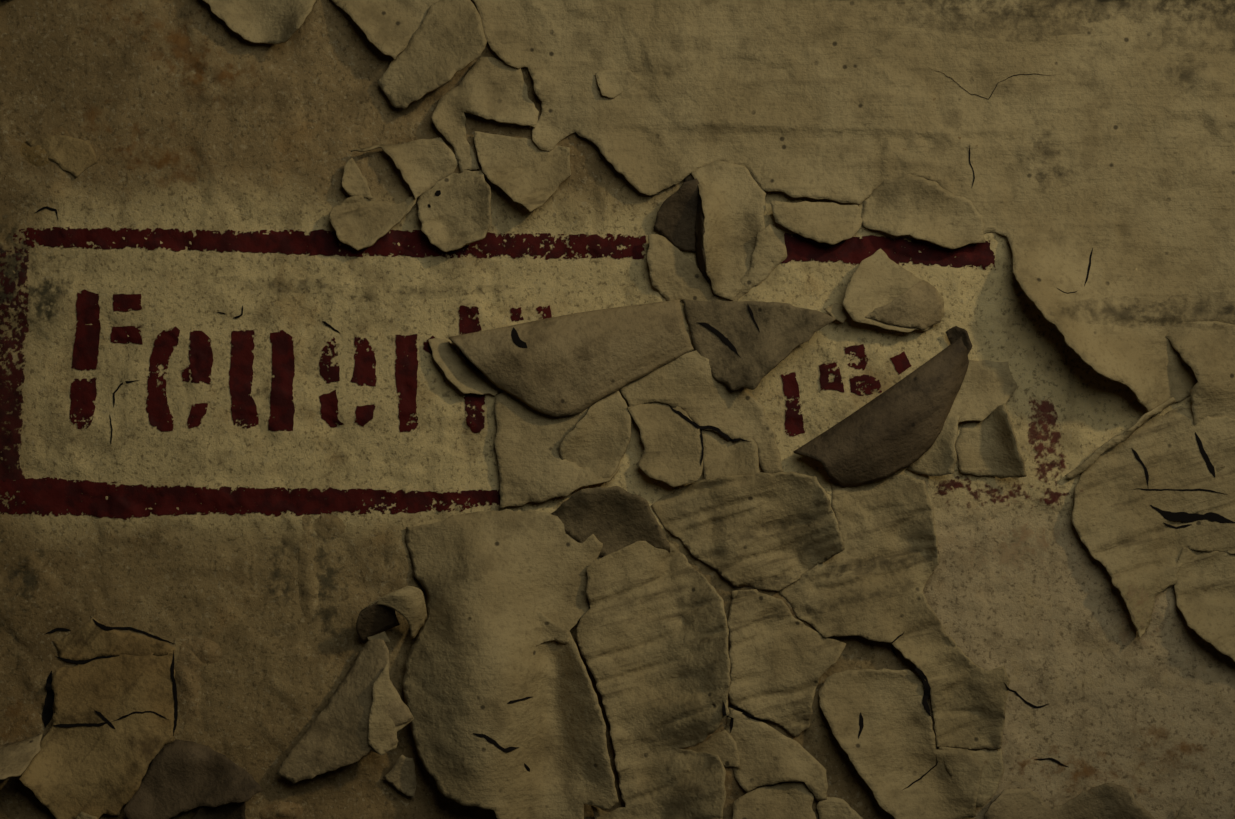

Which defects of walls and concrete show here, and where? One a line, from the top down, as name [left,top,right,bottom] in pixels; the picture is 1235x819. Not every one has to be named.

peeling [202,0,316,44]
peeling [276,0,1235,819]
peeling [0,617,263,819]